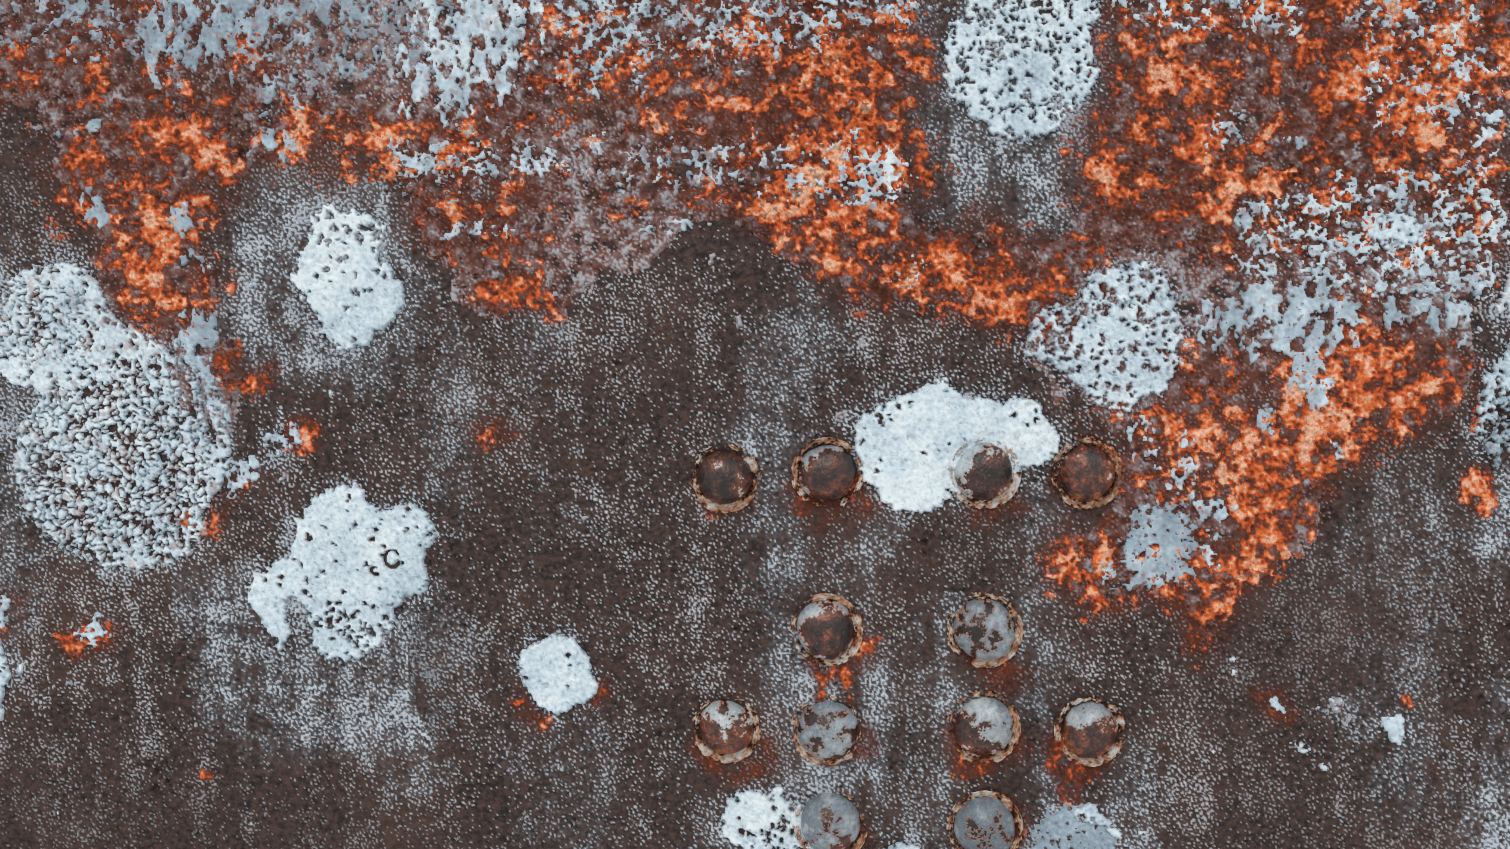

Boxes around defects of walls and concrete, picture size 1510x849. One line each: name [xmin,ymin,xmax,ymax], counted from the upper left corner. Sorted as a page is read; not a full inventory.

corrosion [0,0,1510,434]
corrosion [179,474,251,540]
corrosion [282,416,320,479]
corrosion [475,422,518,453]
corrosion [790,471,870,525]
corrosion [1037,274,1486,669]
corrosion [1456,466,1498,518]
corrosion [53,620,129,660]
corrosion [806,627,882,704]
corrosion [688,736,775,782]
corrosion [945,727,1023,781]
corrosion [1042,725,1112,807]